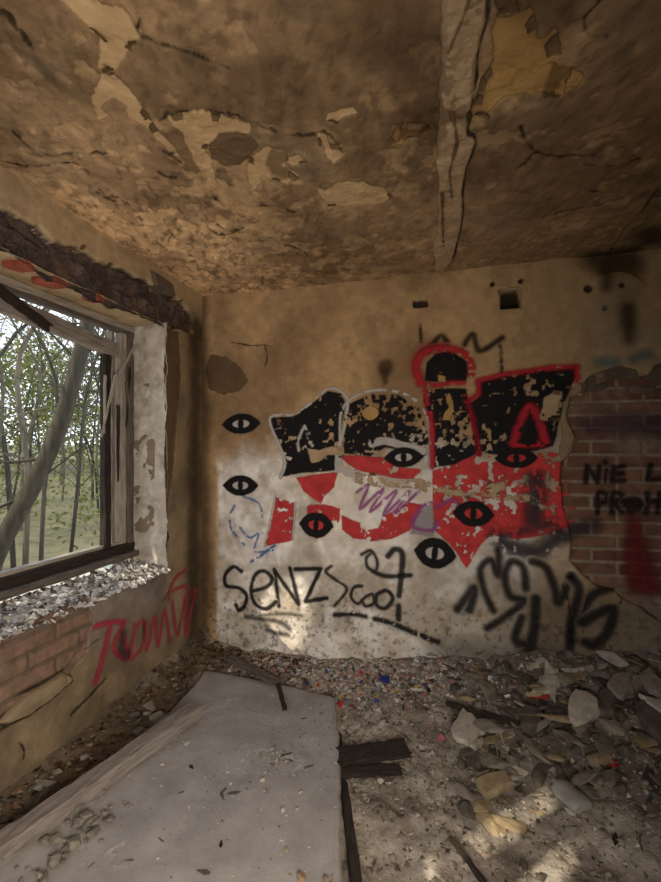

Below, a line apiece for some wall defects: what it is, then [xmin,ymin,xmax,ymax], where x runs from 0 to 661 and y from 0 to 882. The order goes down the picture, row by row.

crack [0,9,33,47]
peeling [471,0,584,121]
peeling [60,0,251,187]
peeling [246,146,307,190]
peeling [317,132,345,164]
peeling [326,107,357,125]
crack [453,0,490,258]
crack [519,125,641,167]
peeling [316,181,393,207]
peeling [204,355,248,395]
flaking render [538,364,661,621]
flaking render [0,596,94,727]